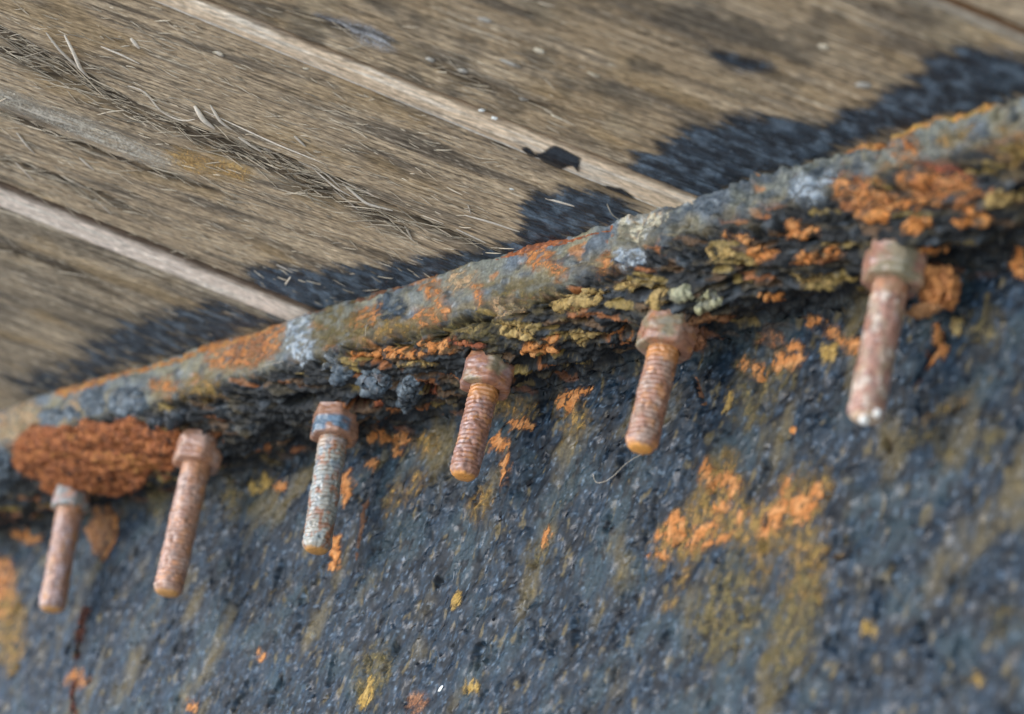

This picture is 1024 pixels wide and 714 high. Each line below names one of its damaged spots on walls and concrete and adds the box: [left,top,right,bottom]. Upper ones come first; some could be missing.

rust [832,103,1024,255]
rust [302,225,641,368]
rust [646,286,668,312]
rust [0,323,286,562]
rust [328,535,341,572]
rust [340,468,355,507]
rust [385,471,421,515]
rust [647,452,833,688]